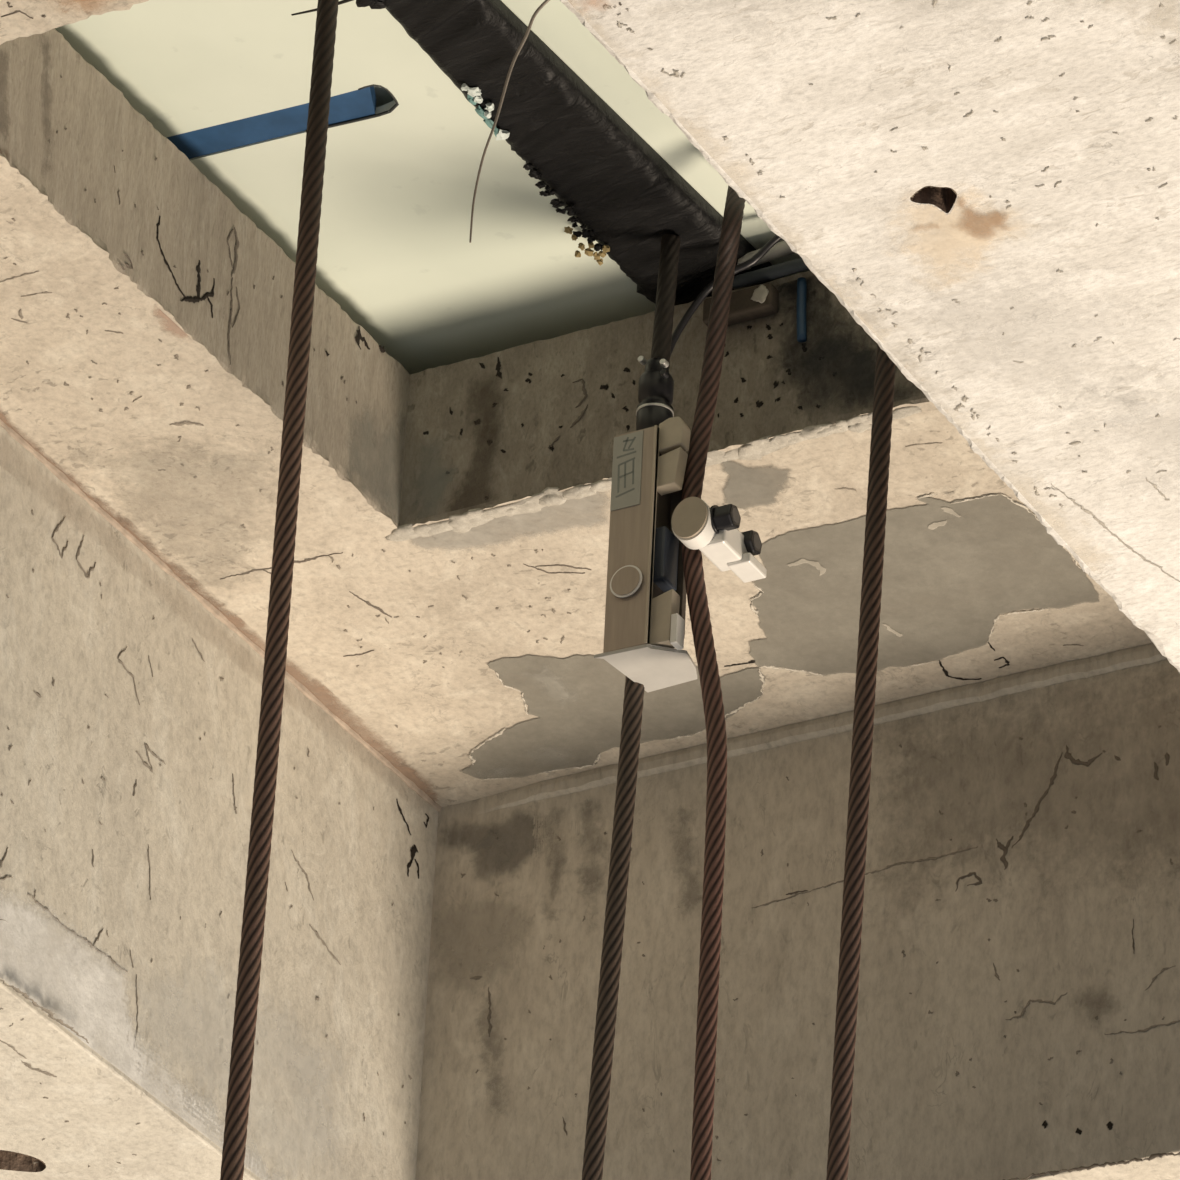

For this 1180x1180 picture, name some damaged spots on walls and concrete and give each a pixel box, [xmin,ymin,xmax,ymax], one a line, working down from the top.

spalling [911,186,999,259]
rust [965,212,1003,235]
crack [156,216,240,365]
damp [778,279,876,406]
peeling [722,461,791,511]
peeling [720,516,866,720]
peeling [877,493,1099,671]
damp [450,818,536,871]
crack [752,745,1121,908]
crack [1154,753,1169,780]
damp [0,896,224,1149]
damp [244,1151,276,1180]